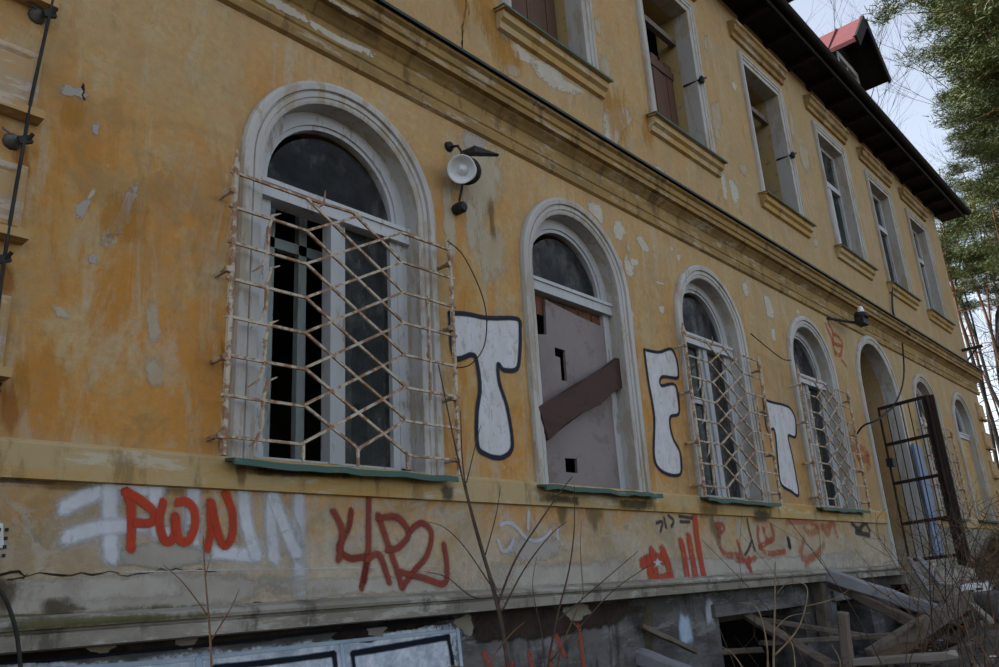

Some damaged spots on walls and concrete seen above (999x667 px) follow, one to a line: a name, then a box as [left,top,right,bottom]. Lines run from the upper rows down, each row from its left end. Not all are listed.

spalling [266,0,376,58]
crack [461,0,470,48]
peeling [499,32,584,96]
peeling [60,83,89,100]
peeling [75,190,96,219]
peeling [88,184,139,264]
peeling [587,201,649,278]
peeling [146,303,160,341]
crack [0,568,216,581]
leakage [0,579,207,631]